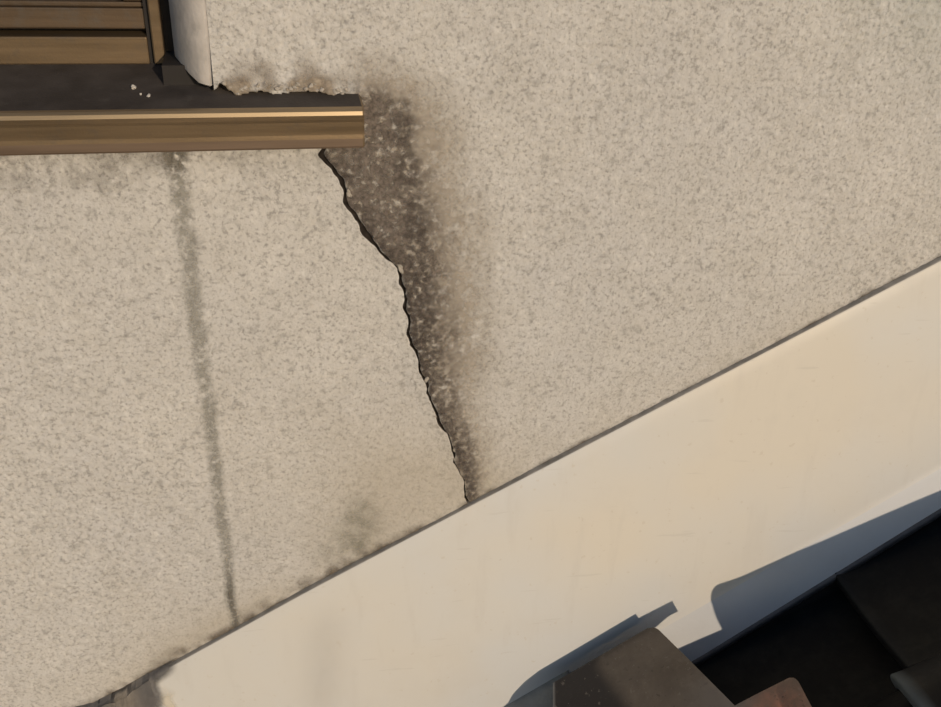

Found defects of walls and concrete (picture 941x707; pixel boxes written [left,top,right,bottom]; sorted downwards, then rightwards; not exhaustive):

water stain [163,152,205,345]
crack [318,149,468,501]
water stain [348,77,477,496]
water stain [198,360,239,627]
water stain [131,661,171,707]